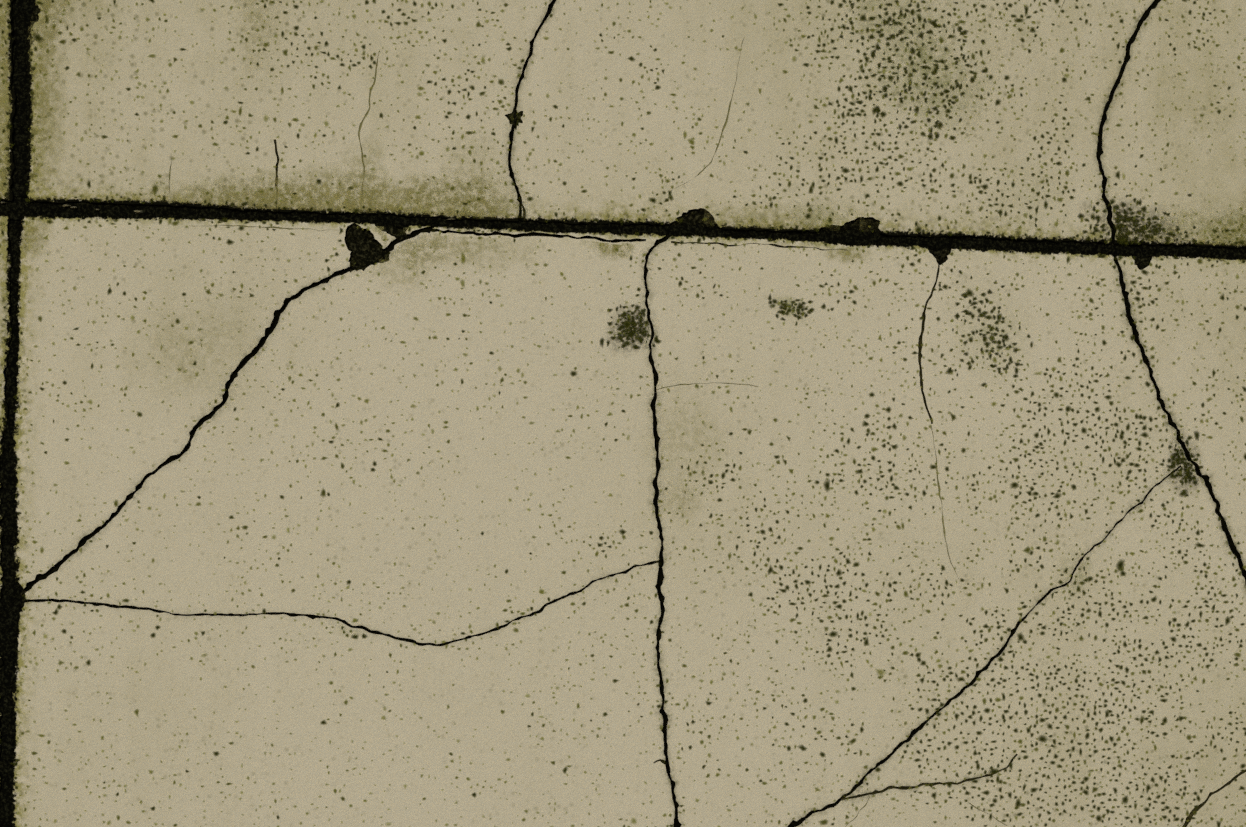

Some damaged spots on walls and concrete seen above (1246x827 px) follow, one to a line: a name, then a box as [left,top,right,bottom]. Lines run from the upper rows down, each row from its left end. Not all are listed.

leakage [185,254,679,724]
crack [24,0,848,827]
crack [787,0,1246,827]